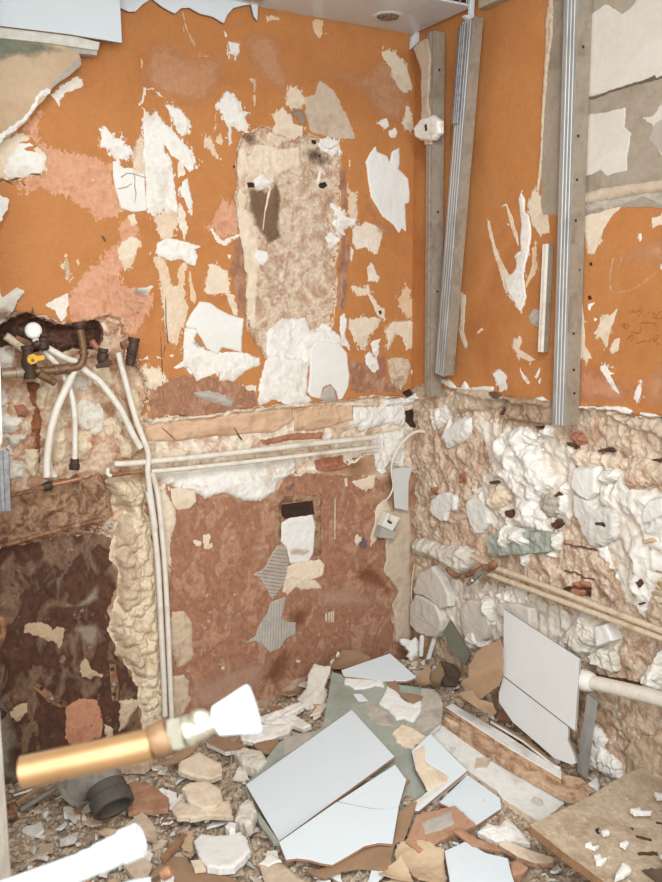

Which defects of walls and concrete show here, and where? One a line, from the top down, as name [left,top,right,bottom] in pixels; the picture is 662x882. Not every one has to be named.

spalling [0,0,662,684]
spalling [484,634,505,712]
spalling [570,691,662,785]